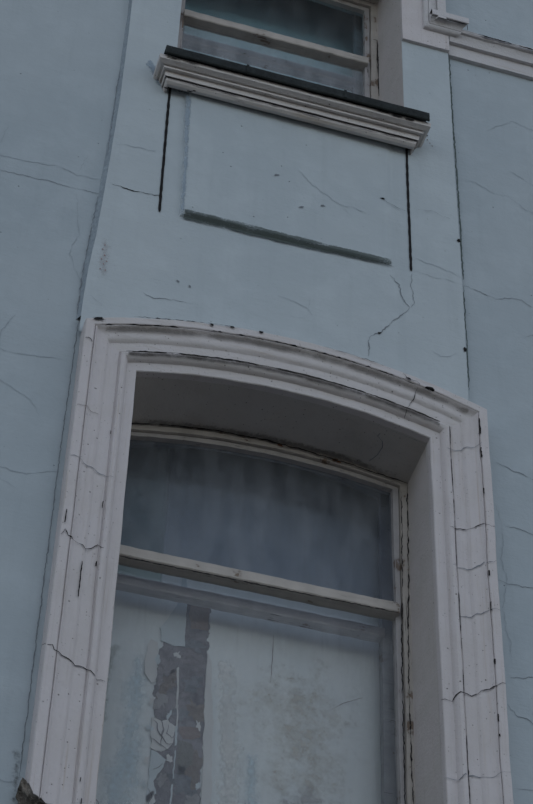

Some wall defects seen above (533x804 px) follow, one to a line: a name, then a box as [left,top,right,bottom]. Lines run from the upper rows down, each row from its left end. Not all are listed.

crack [1,128,159,277]
crack [106,259,533,664]
crack [61,509,103,596]
crack [442,669,528,702]
flaking render [15,777,47,804]
crack [449,737,511,800]